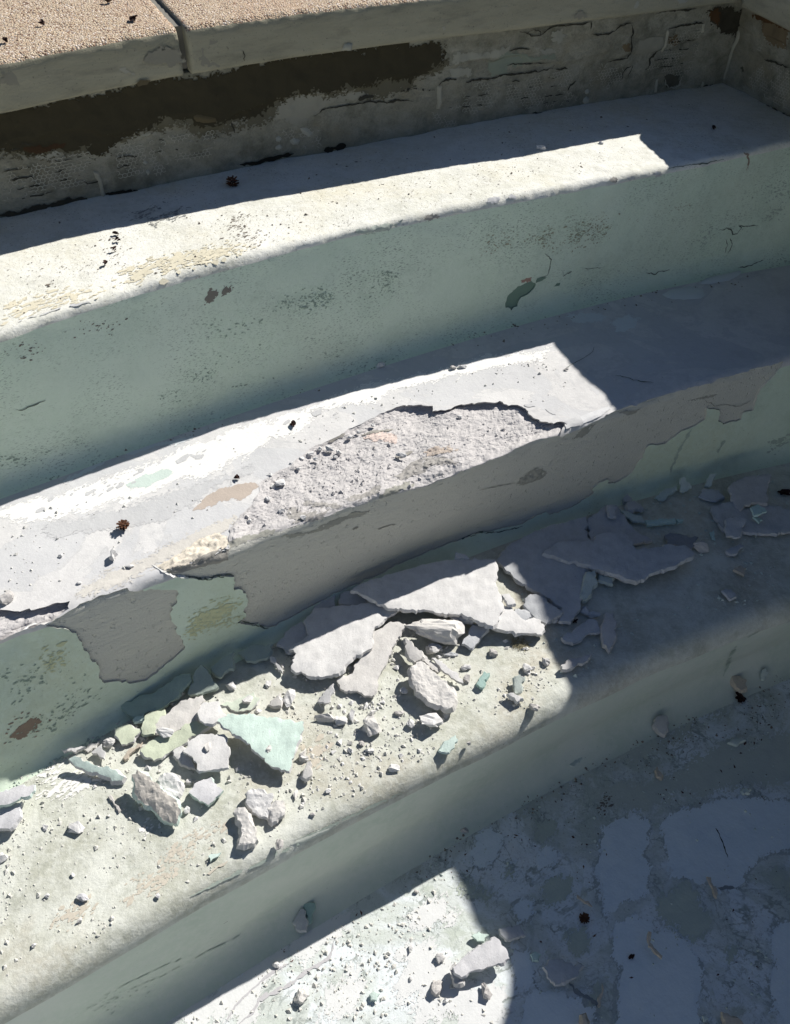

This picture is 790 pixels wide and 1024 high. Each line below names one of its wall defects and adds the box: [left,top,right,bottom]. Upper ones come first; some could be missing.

crack [317,8,704,115]
peeling [505,277,560,310]
peeling [0,361,790,832]
corrosion [4,712,51,744]